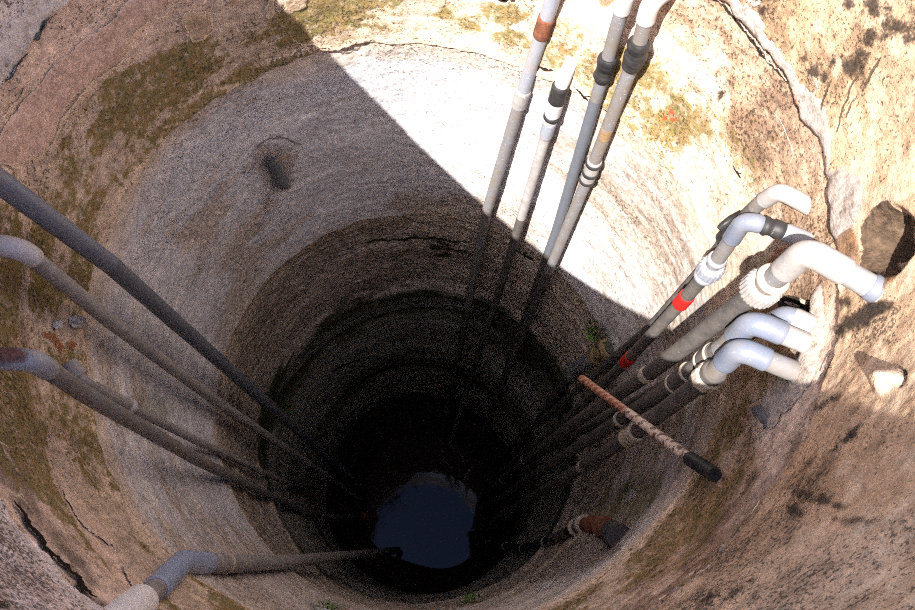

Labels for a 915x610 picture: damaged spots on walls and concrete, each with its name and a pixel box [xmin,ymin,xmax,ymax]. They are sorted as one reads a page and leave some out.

crack [714,0,787,82]
crack [362,236,475,245]
spalling [836,200,915,290]
crack [14,500,98,598]